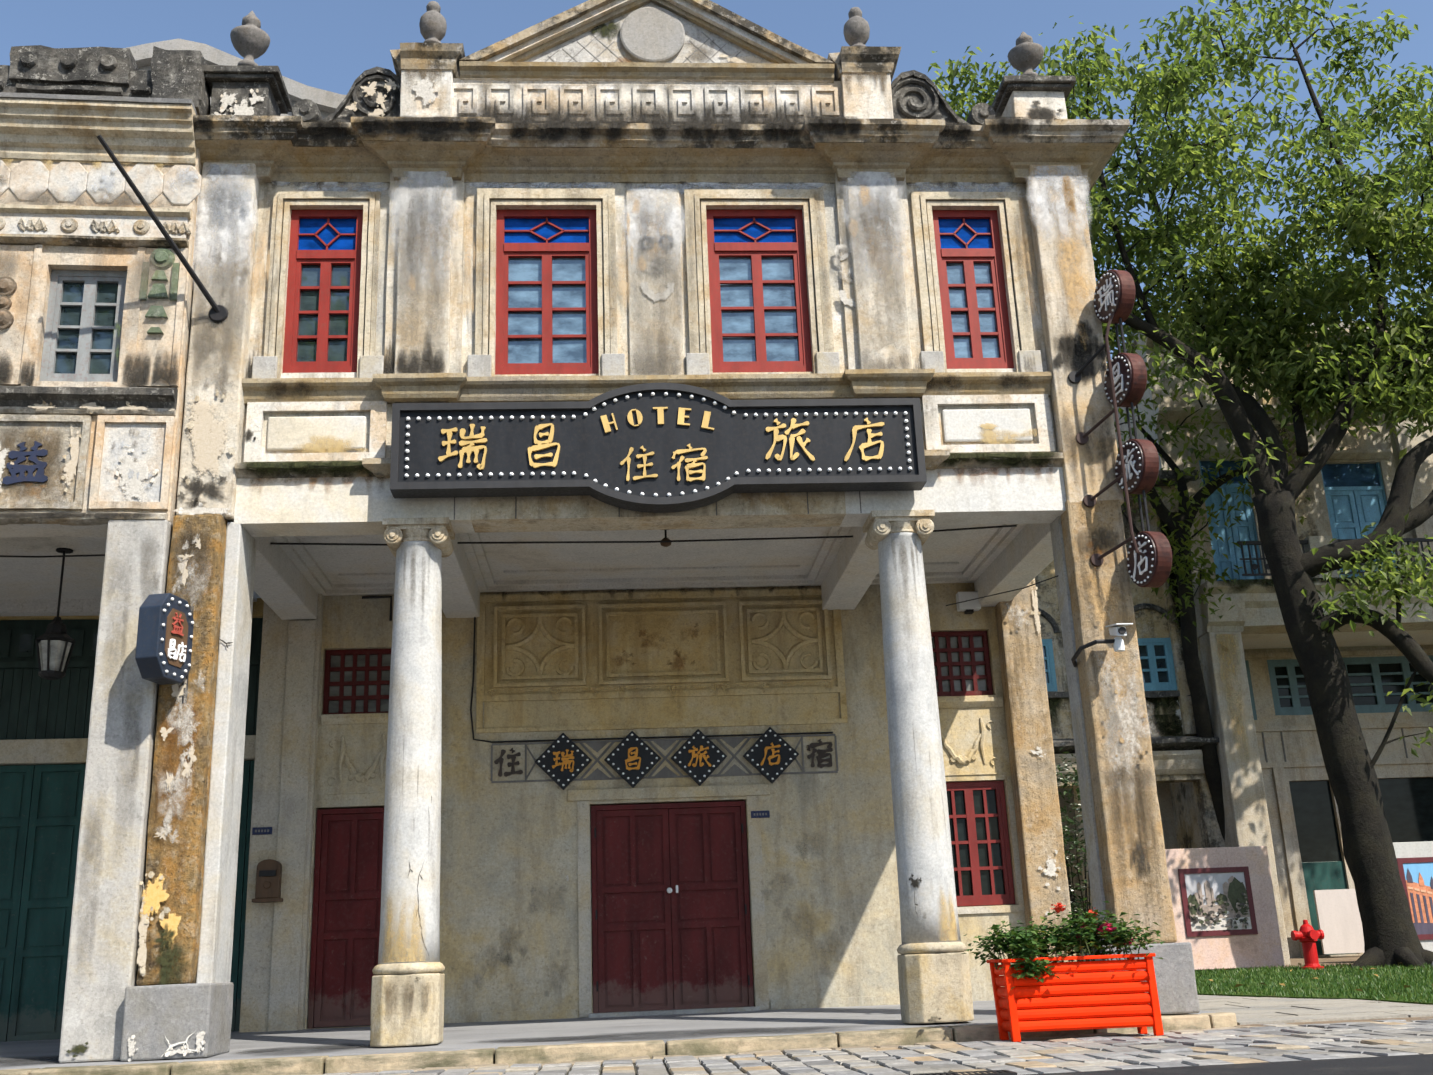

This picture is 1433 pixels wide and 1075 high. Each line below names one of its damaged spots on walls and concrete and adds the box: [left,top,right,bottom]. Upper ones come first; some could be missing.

peeling [214,89,265,115]
damp [174,100,1117,197]
damp [0,359,35,386]
damp [119,353,178,388]
damp [1053,321,1108,381]
peeling [0,444,14,493]
peeling [61,426,82,492]
peeling [80,401,159,502]
peeling [174,538,204,606]
peeling [154,676,204,840]
peeling [137,871,181,976]